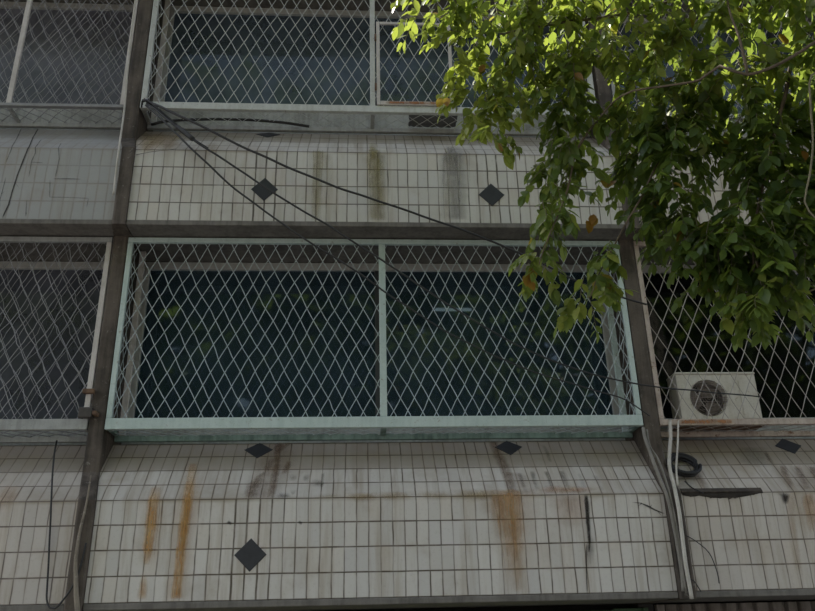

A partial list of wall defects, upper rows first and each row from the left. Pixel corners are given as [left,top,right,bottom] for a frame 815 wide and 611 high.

crack [0,129,88,216]
corrosion [175,491,190,596]